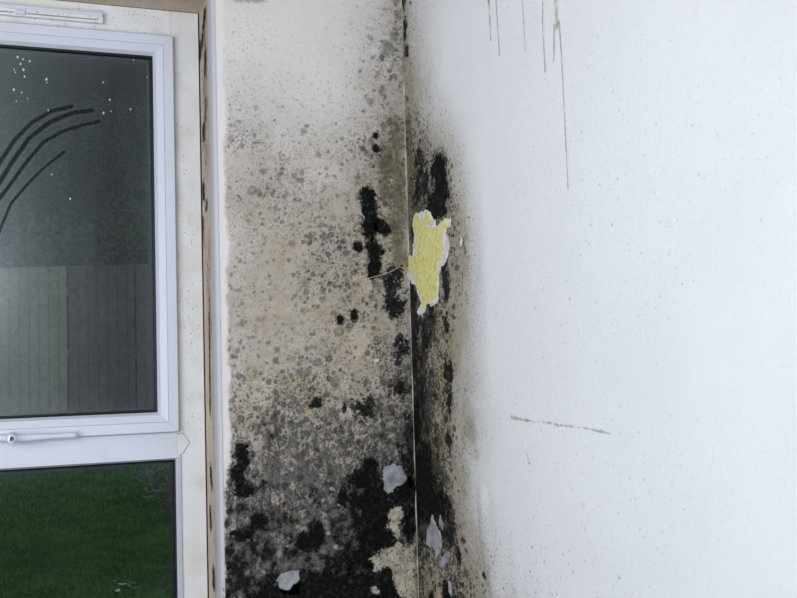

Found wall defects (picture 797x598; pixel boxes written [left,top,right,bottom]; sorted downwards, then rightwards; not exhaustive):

leakage [225,0,487,598]
peeling [407,209,451,316]
peeling [382,463,407,494]
peeling [276,570,300,590]